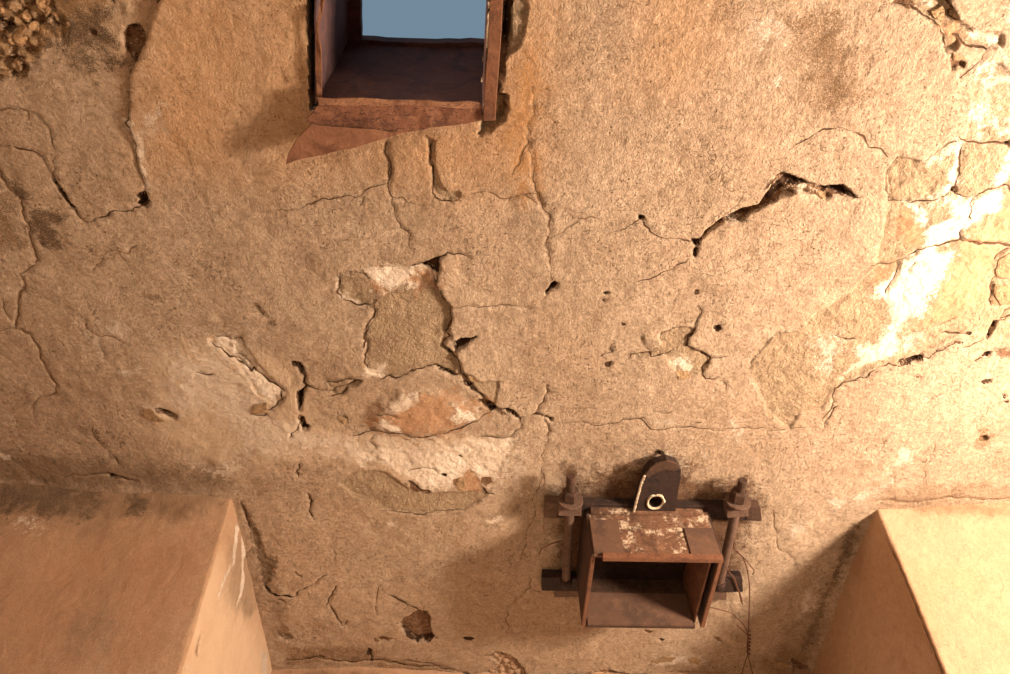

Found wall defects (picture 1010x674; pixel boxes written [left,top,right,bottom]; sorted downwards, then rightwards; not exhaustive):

spalling [0,0,70,89]
crack [0,0,160,222]
spalling [694,172,860,256]
flaking render [750,0,1010,430]
crack [0,171,57,415]
flaking render [331,256,499,410]
crack [279,86,1010,632]
flaking render [626,289,727,390]
flaking render [337,417,524,516]
corrosion [543,443,771,526]
corrosion [539,507,582,571]
corrosion [711,519,759,583]